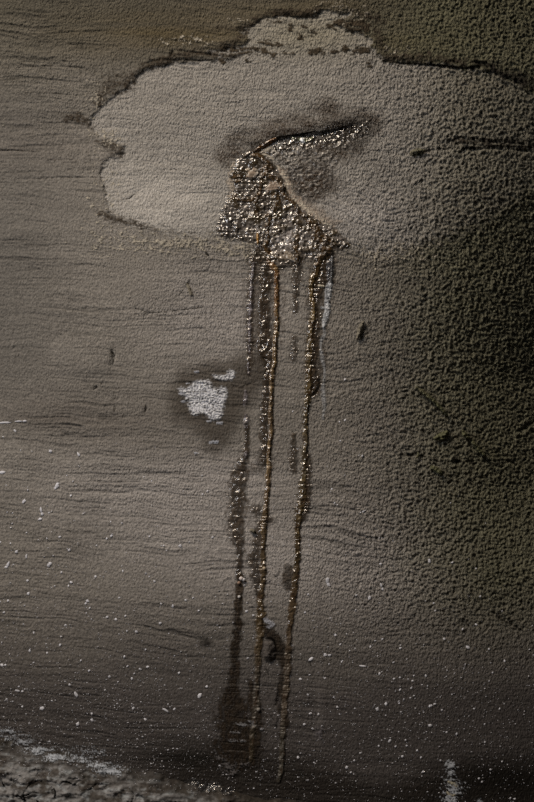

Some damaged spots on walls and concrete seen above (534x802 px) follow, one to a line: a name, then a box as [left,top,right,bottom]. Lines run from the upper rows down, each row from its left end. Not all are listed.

crack [269,131,315,140]
flaking render [64,1,534,279]
efflorescence [179,370,235,425]
corrosion [213,241,331,782]